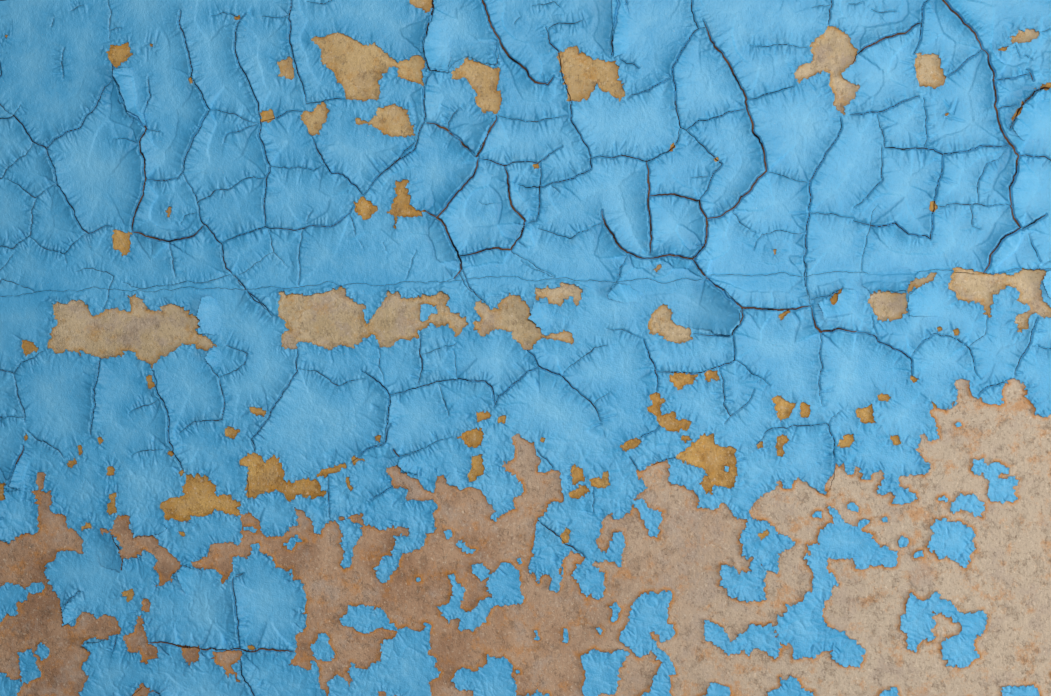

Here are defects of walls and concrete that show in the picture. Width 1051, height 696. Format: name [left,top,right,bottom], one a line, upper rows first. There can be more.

peeling [311,32,425,138]
peeling [448,42,502,114]
peeling [557,46,625,102]
peeling [794,26,860,115]
crack [0,0,1051,498]
peeling [22,294,225,389]
peeling [278,282,583,350]
peeling [861,267,1051,336]
crack [0,353,62,543]
peeling [0,378,1051,696]
crack [149,573,292,696]